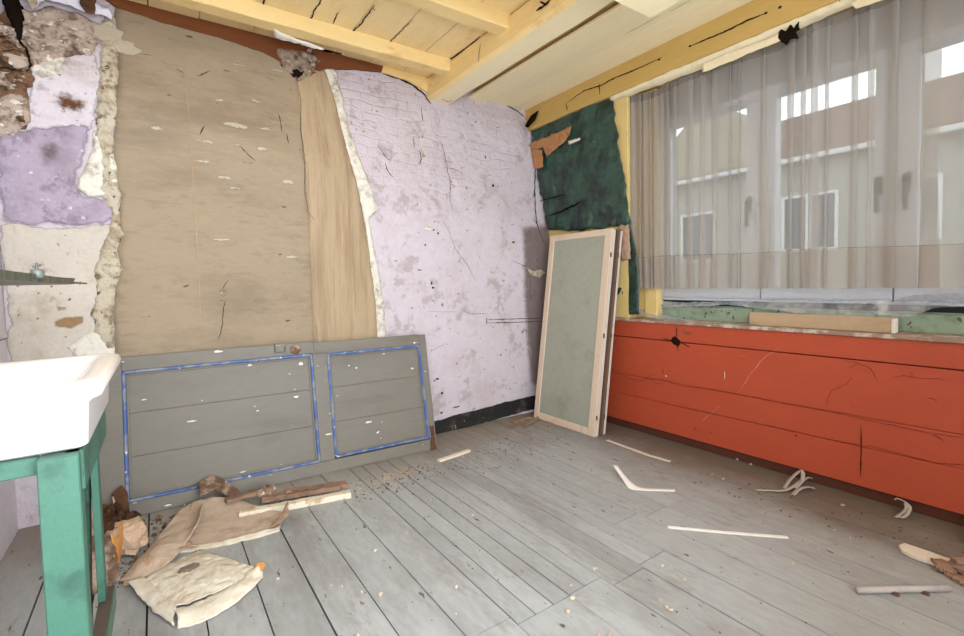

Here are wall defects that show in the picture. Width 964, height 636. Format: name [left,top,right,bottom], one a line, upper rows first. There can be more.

crack [310,0,375,31]
flaking render [0,5,124,362]
spalling [276,48,386,338]
crack [629,360,963,477]